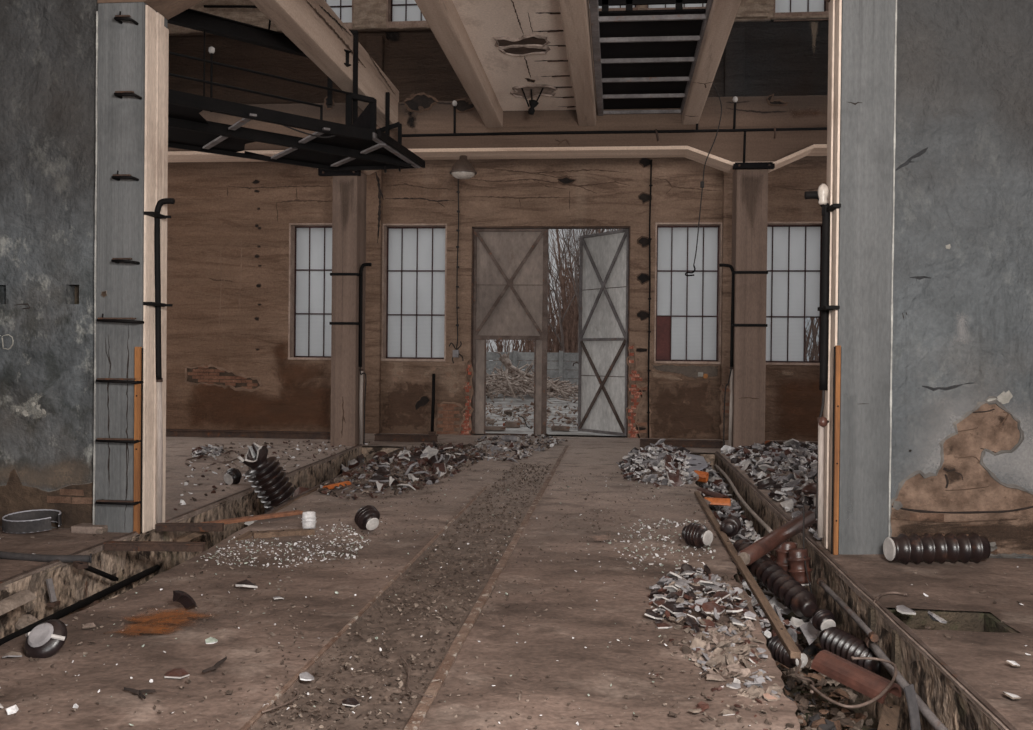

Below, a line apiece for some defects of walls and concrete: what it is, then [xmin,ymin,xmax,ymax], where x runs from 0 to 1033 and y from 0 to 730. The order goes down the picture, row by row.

spalling [493,34,551,56]
spalling [453,98,475,113]
spalling [510,78,557,99]
crack [105,324,129,526]
spalling [185,364,263,392]
spalling [414,360,474,435]
spalling [626,343,652,438]
spalling [890,390,1033,558]